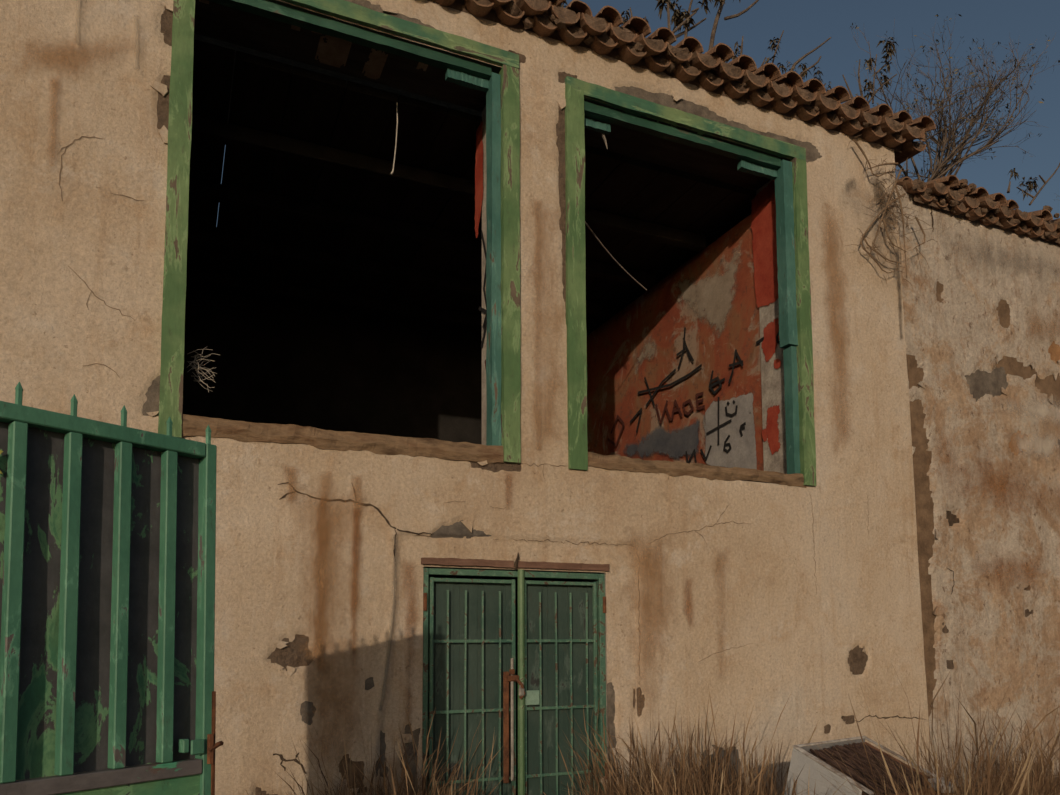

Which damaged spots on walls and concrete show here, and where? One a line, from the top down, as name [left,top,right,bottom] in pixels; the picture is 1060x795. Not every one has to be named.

spalling [160,0,173,46]
spalling [151,75,170,144]
crack [57,136,103,201]
crack [68,266,133,319]
spalling [964,341,1060,409]
crack [278,482,432,557]
spalling [431,519,492,539]
spalling [906,354,959,716]
spalling [267,634,315,677]
spalling [848,645,868,675]
crack [854,714,926,722]
crack [273,753,307,774]